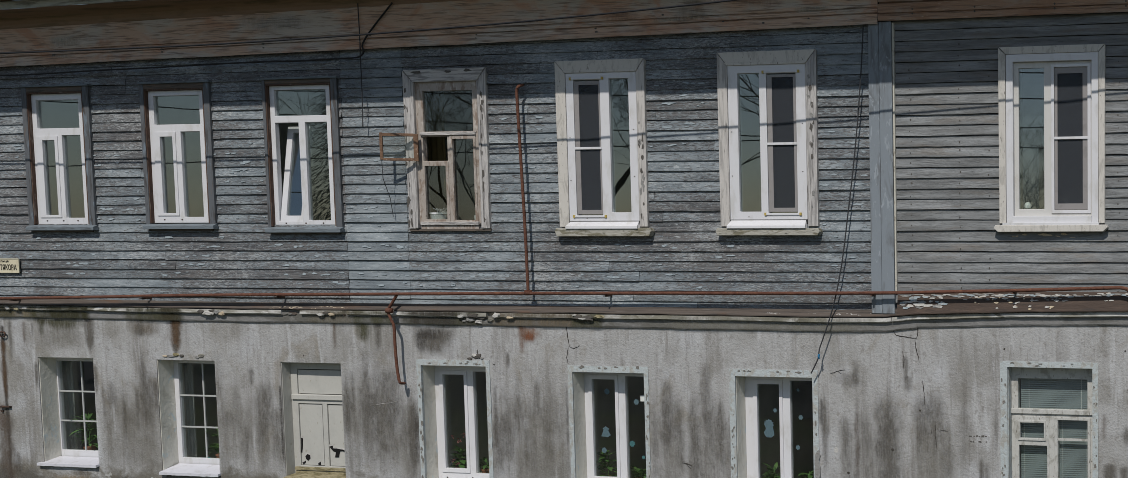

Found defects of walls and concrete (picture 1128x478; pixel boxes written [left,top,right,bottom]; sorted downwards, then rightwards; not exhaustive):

peeling [900,292,1128,310]
rust [1,326,15,478]
water stain [409,404,418,465]
water stain [1105,465,1126,478]